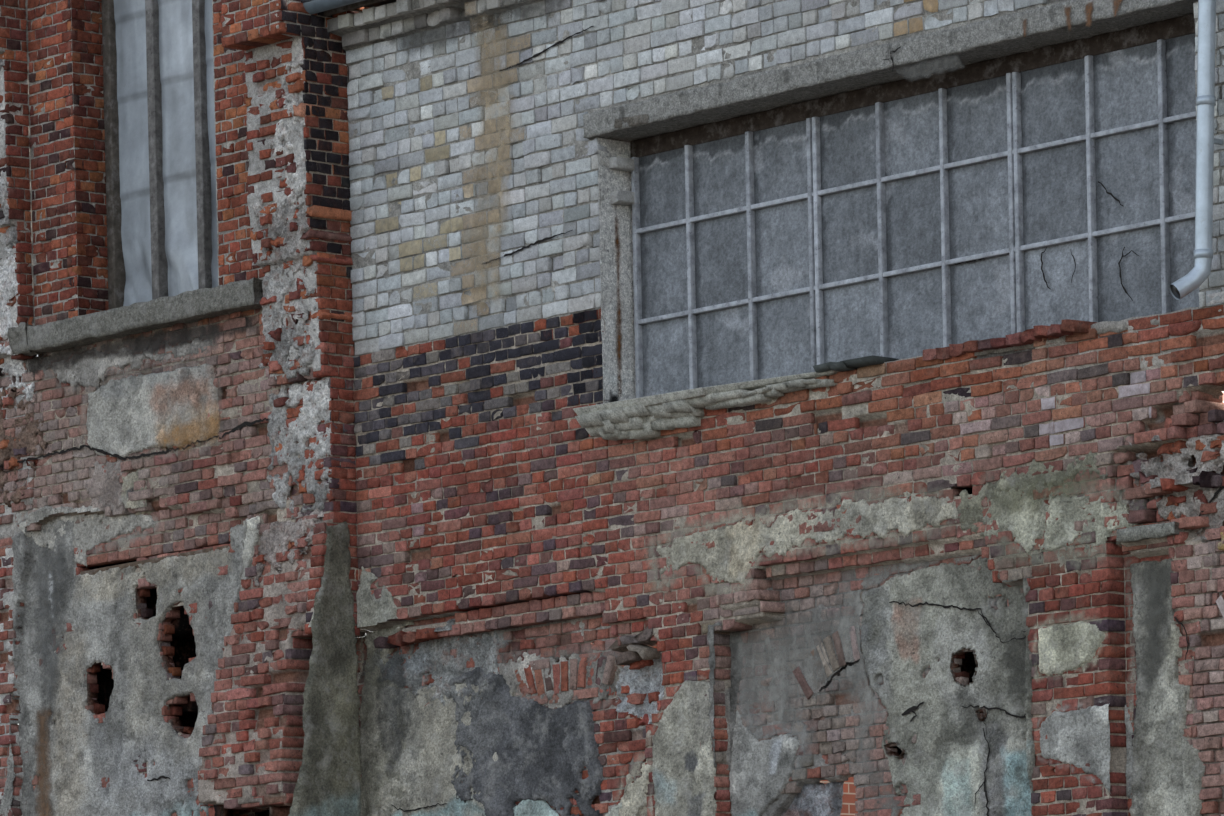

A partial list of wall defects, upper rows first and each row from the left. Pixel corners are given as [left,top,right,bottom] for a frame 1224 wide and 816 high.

flaking render [0,49,844,816]
flaking render [650,434,1224,593]
rust [35,710,51,816]
crack [820,659,860,691]
crack [902,701,924,722]
crack [889,601,1026,643]
flaking render [844,555,1111,816]
crack [961,705,1026,816]
flaking render [1125,558,1205,816]